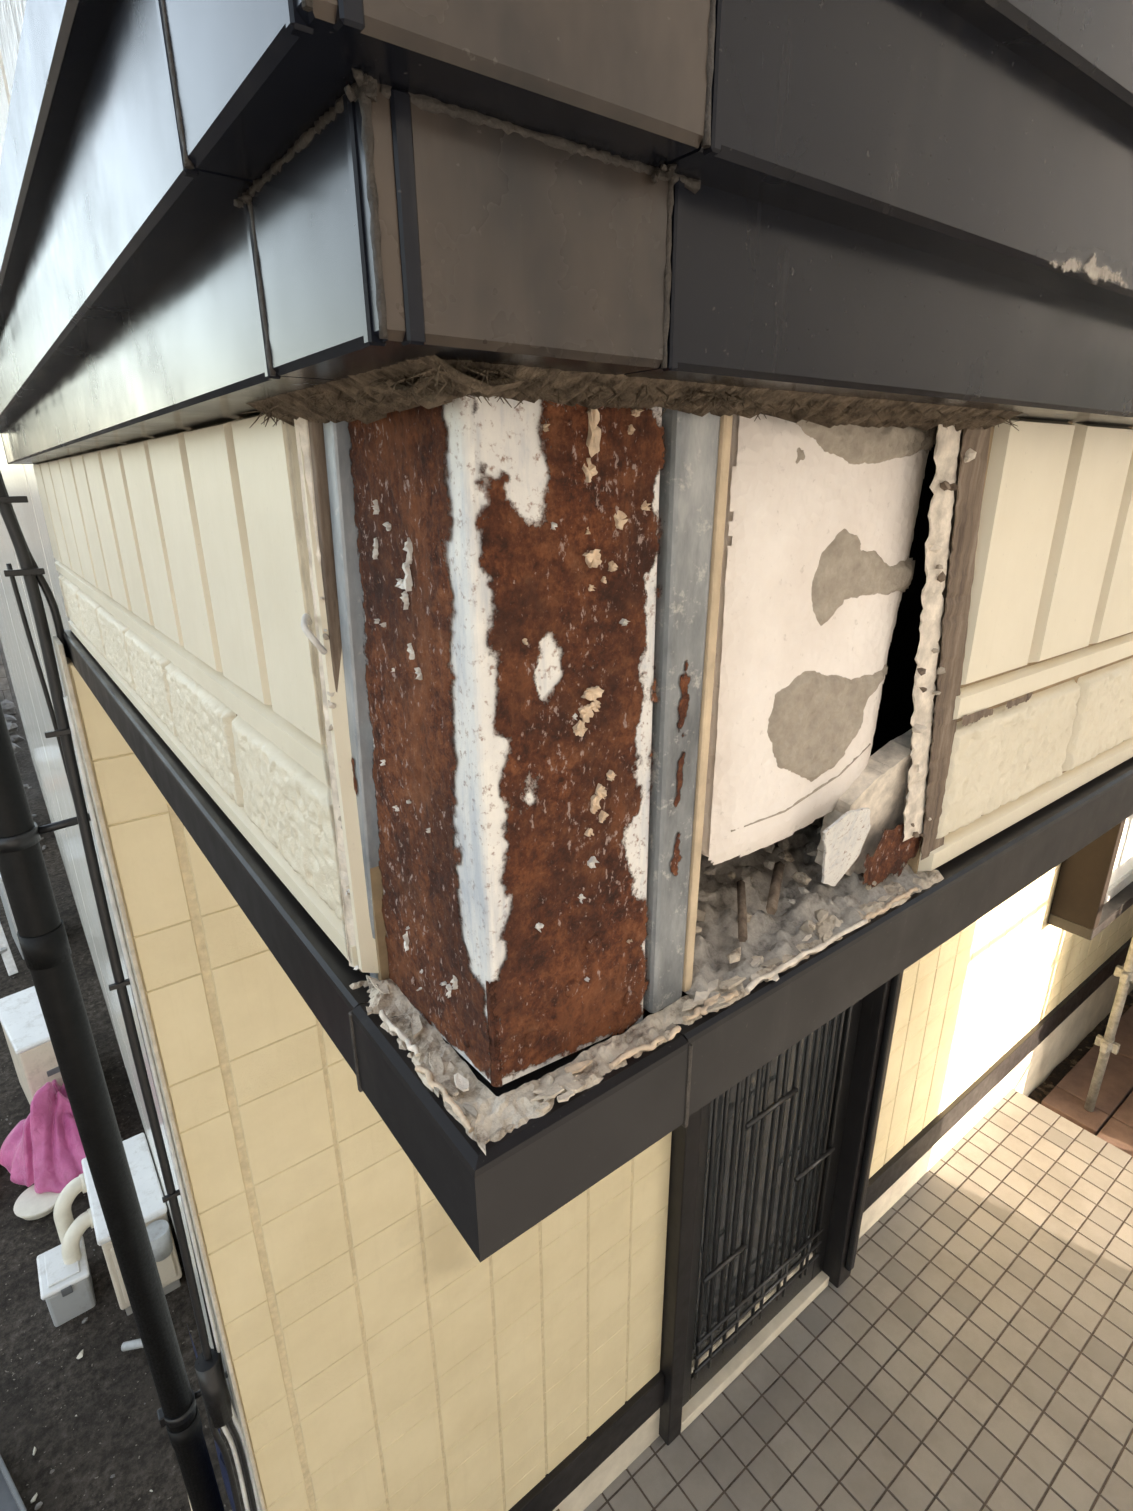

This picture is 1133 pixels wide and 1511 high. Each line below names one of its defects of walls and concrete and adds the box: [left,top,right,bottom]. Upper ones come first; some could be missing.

rust [348,400,666,1087]
spalling [294,408,1032,1155]
rust [670,832,682,876]
rust [674,660,690,807]